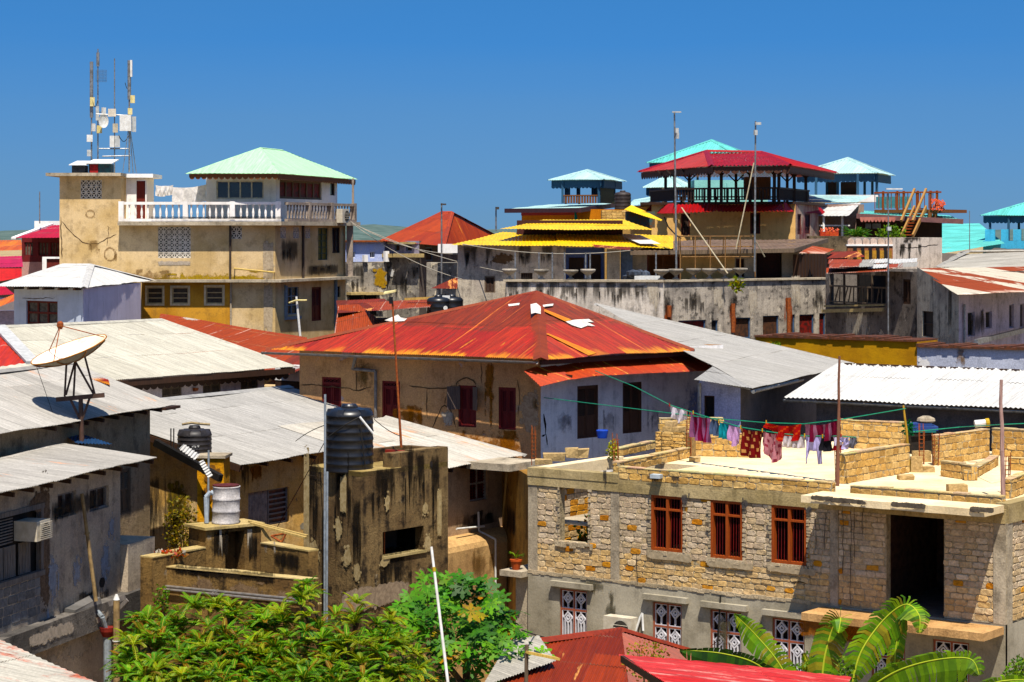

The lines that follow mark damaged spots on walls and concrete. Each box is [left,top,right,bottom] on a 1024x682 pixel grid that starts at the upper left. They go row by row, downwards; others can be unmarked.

leakage [685,288,757,316]
corrosion [547,333,596,355]
leakage [309,460,319,537]
spalling [333,474,409,612]
leakage [334,447,439,562]
leakage [380,551,412,584]